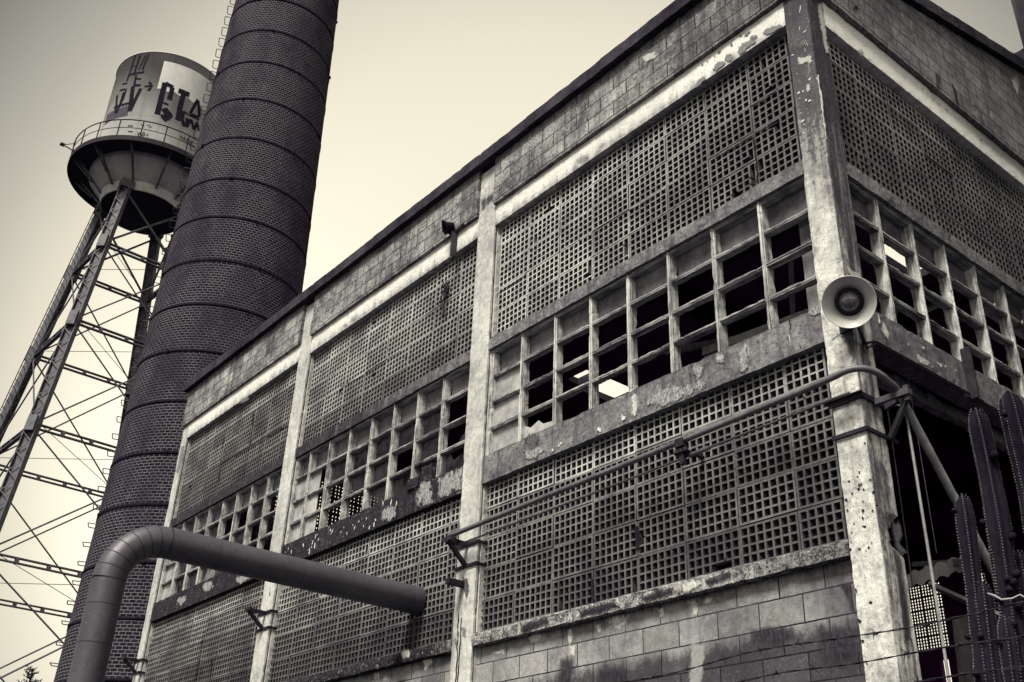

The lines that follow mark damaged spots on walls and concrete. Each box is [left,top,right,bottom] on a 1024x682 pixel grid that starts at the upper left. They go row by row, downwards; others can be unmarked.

peeling [701,24,783,71]
peeling [406,463,463,508]
peeling [354,499,397,529]
water stain [521,617,548,643]
water stain [580,601,629,632]
water stain [751,626,794,644]
water stain [560,629,575,682]
efflorescence [690,643,705,682]